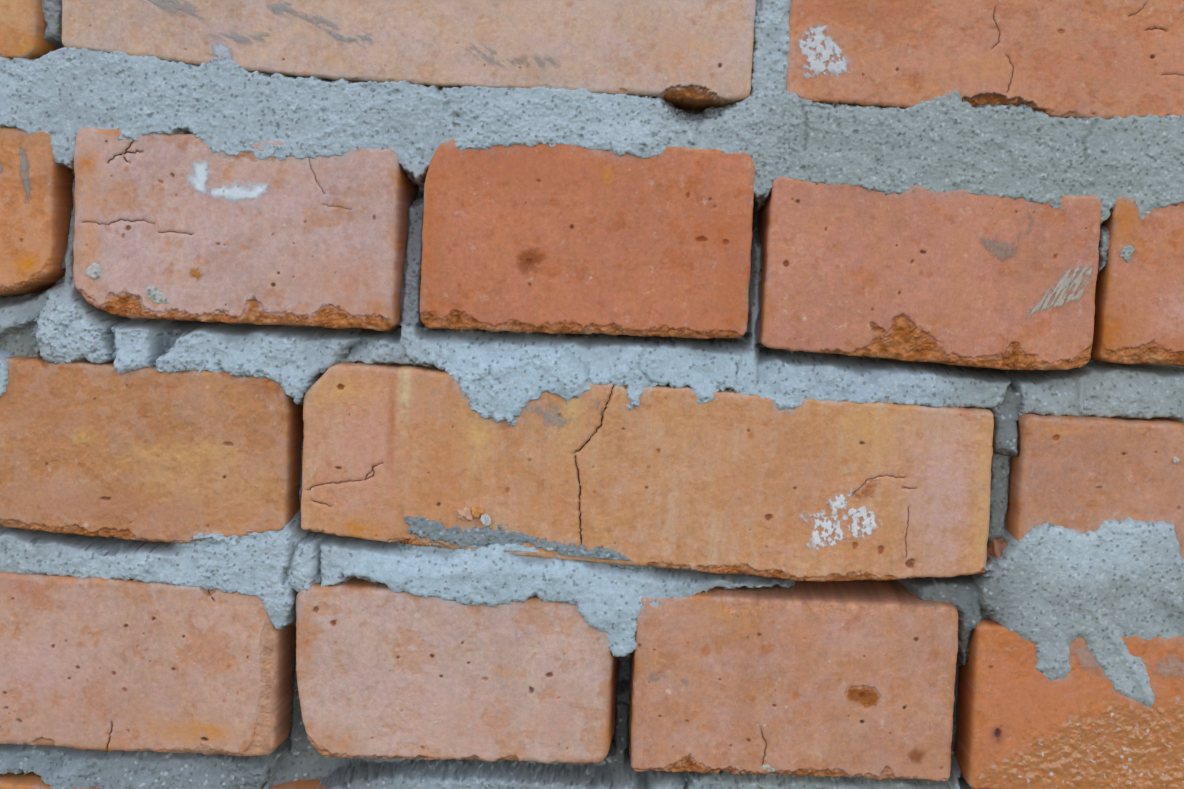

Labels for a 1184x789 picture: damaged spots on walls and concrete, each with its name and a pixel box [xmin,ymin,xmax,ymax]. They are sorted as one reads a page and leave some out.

water stain [799,25,848,77]
crack [993,9,1014,92]
spalling [657,85,728,107]
crack [108,141,140,163]
crack [83,219,193,235]
spalling [77,288,401,331]
spalling [420,310,742,339]
spalling [808,313,1184,370]
crack [574,385,614,544]
water stain [801,490,882,550]
crack [853,475,916,557]